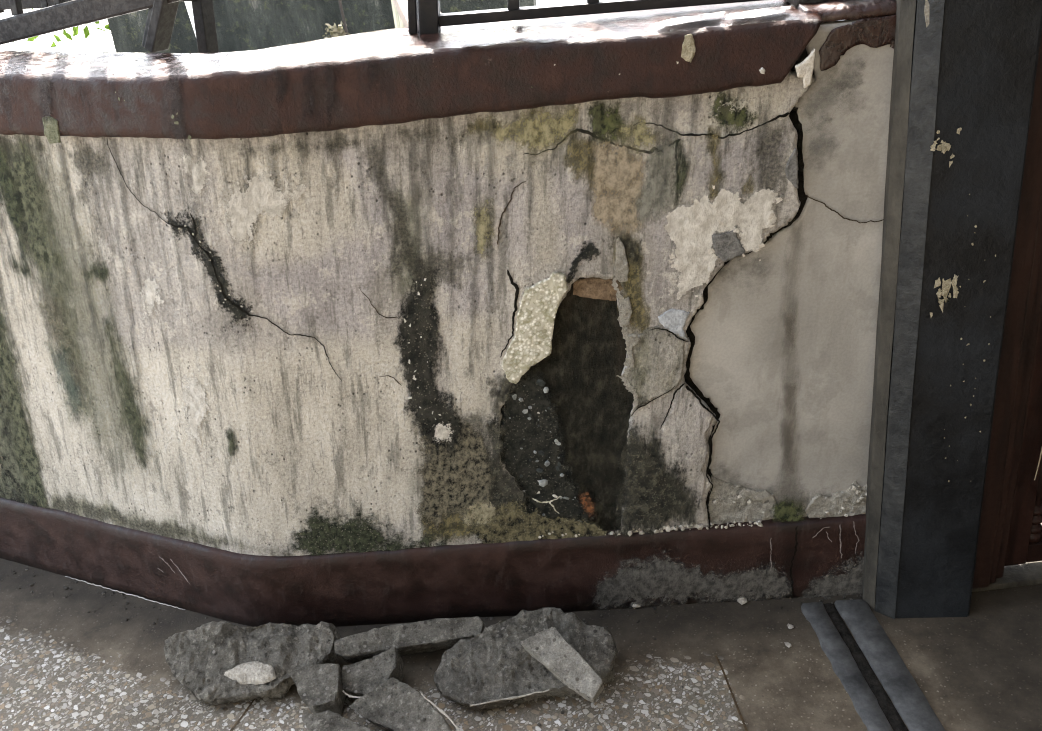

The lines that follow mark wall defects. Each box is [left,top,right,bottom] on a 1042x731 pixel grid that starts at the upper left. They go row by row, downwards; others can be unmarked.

peeling [681,34,695,63]
water stain [12,257,30,276]
water stain [83,258,110,283]
crack [107,139,342,381]
crack [500,270,519,357]
crack [497,181,526,245]
water stain [590,134,678,263]
crack [523,108,884,530]
peeling [664,185,783,300]
peeling [930,274,959,317]
water stain [393,259,505,531]
flaking render [465,237,778,545]